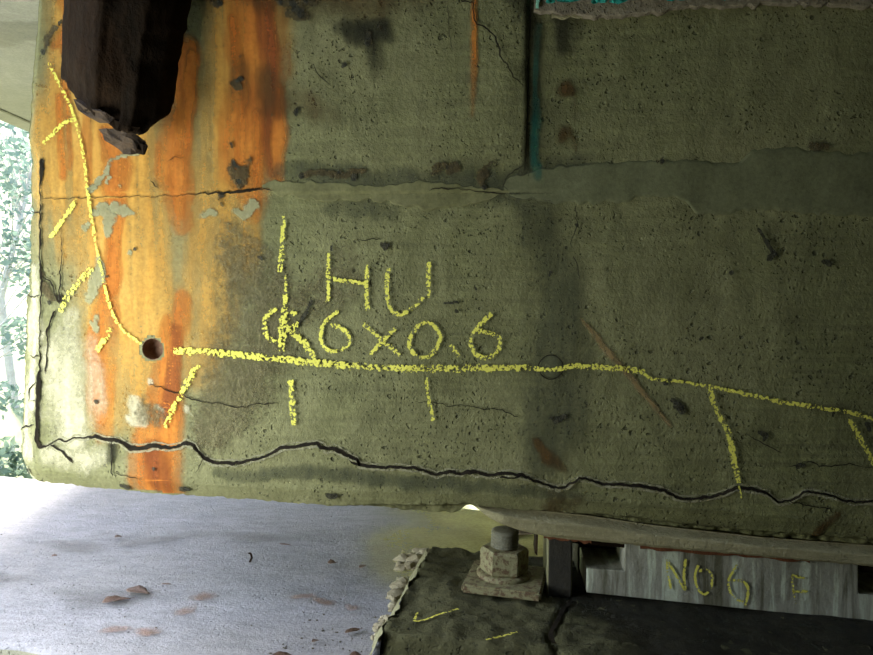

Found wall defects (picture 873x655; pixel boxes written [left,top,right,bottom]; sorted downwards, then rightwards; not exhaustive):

damp [335,20,390,64]
damp [515,0,539,125]
spalling [534,0,873,21]
rust [34,0,286,493]
crack [21,158,873,513]